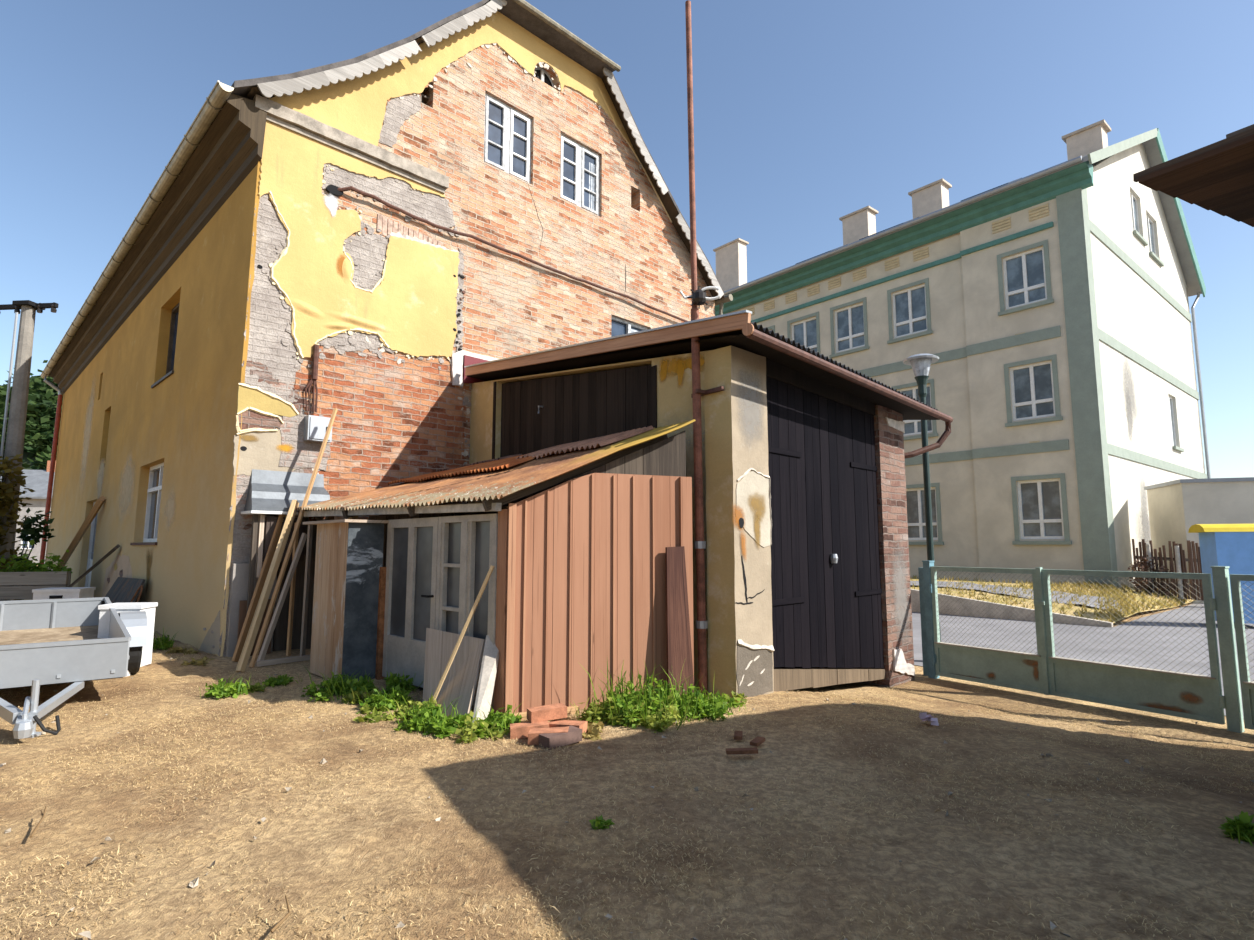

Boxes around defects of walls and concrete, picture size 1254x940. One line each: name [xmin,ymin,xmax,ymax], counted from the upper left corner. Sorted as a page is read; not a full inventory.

flaking render [199,44,714,657]
spalling [736,468,772,547]